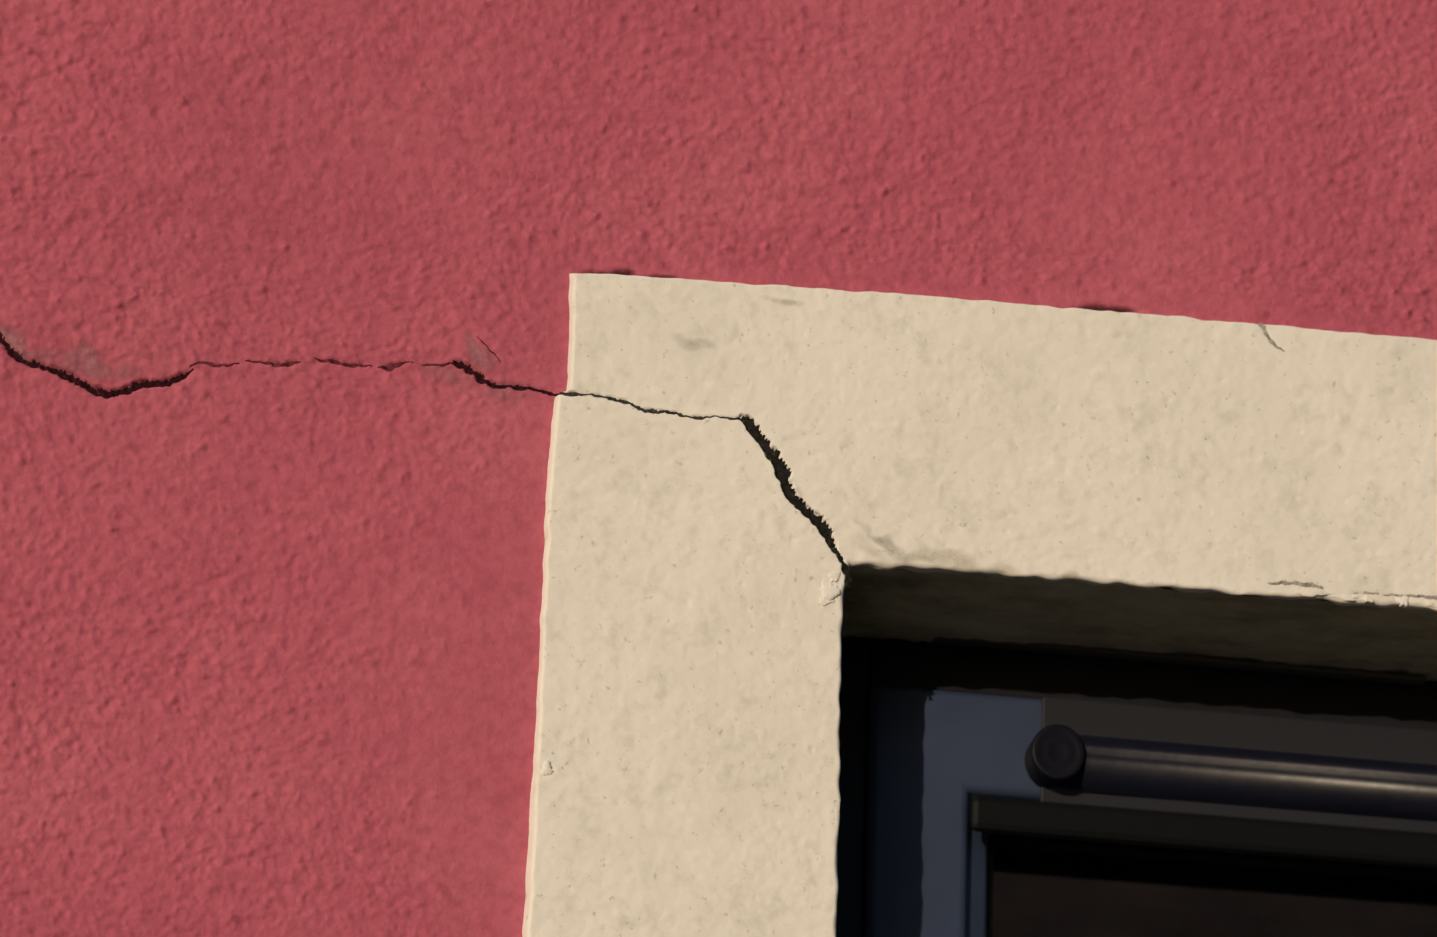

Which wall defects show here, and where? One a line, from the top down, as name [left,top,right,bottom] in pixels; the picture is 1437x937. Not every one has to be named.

crack [0,332,852,588]